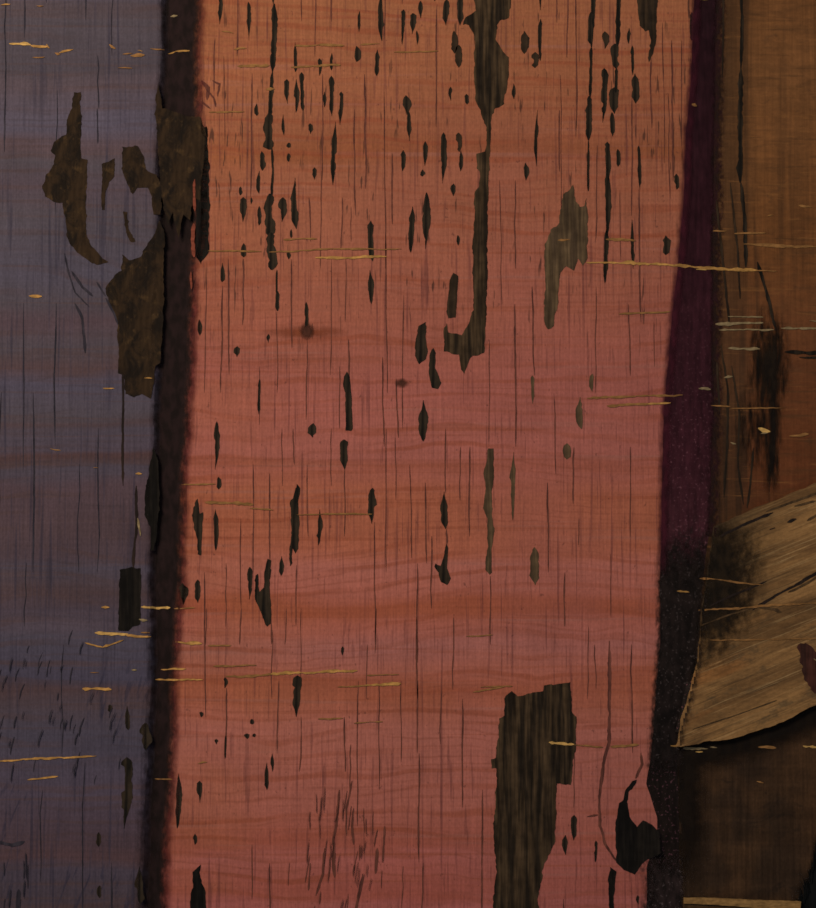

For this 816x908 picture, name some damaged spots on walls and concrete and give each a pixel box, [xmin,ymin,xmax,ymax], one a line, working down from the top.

peeling [637,0,658,61]
peeling [42,92,108,265]
peeling [101,85,210,398]
peeling [408,192,431,252]
peeling [415,0,515,389]
peeling [544,185,588,329]
peeling [601,68,621,282]
peeling [118,567,141,631]
peeling [247,485,300,626]
peeling [190,865,206,908]
peeling [491,682,577,908]
peeling [608,780,661,908]